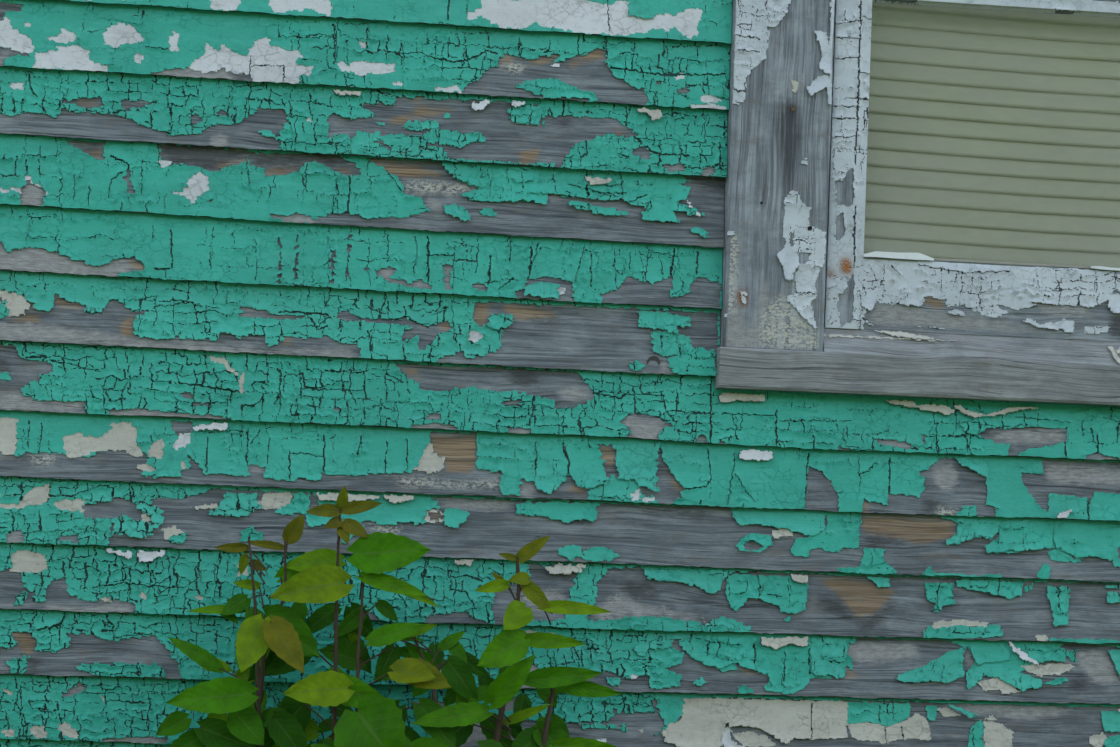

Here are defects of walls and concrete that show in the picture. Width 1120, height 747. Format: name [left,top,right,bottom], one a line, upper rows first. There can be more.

peeling [0,0,1120,456]
crack [0,0,1120,574]
crack [0,457,300,747]
crack [254,627,334,708]
crack [305,554,764,735]
peeling [0,290,1120,747]
crack [647,567,798,609]
crack [811,698,912,743]
crack [925,568,1119,689]